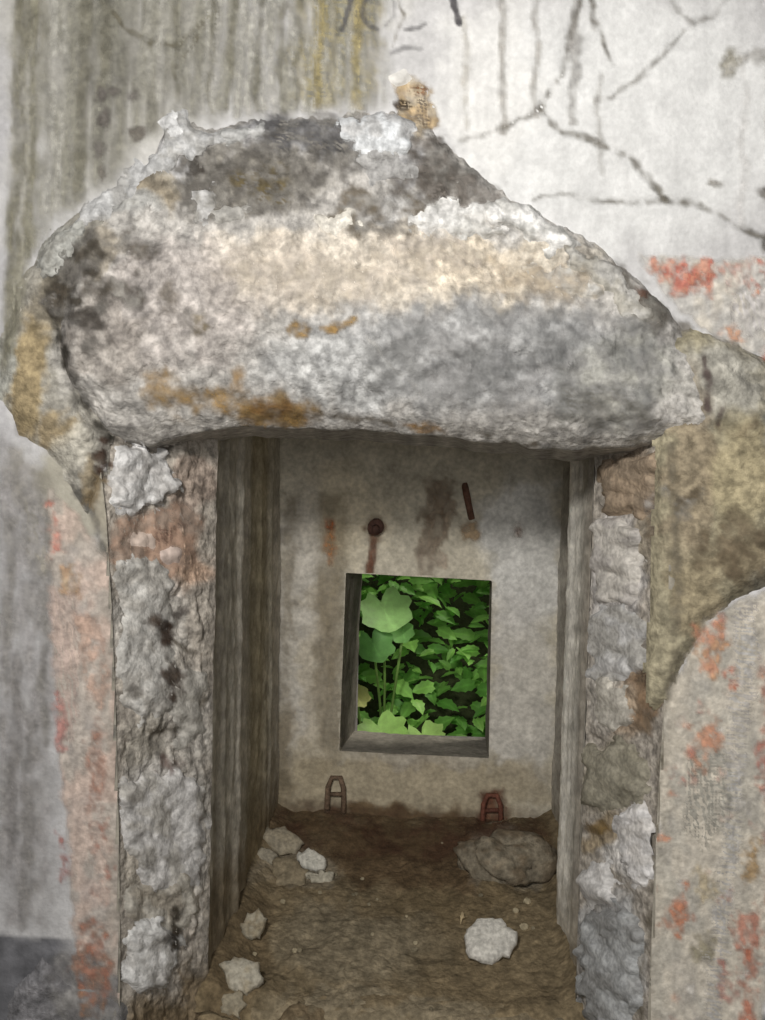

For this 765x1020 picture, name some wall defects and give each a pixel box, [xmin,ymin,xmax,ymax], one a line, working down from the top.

crack [570,0,609,55]
crack [576,135,607,148]
damp [4,0,392,362]
damp [394,136,499,216]
crack [632,159,687,204]
crack [745,230,764,238]
peeling [643,242,765,357]
corrosion [366,525,386,573]
peeling [572,451,765,1020]